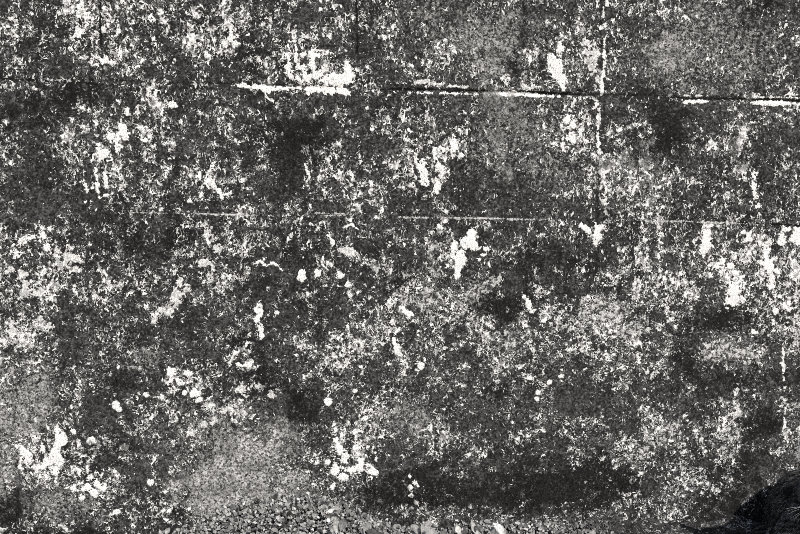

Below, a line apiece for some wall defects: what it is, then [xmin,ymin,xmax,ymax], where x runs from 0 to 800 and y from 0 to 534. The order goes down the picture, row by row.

damp [270,108,338,170]
damp [0,387,55,435]